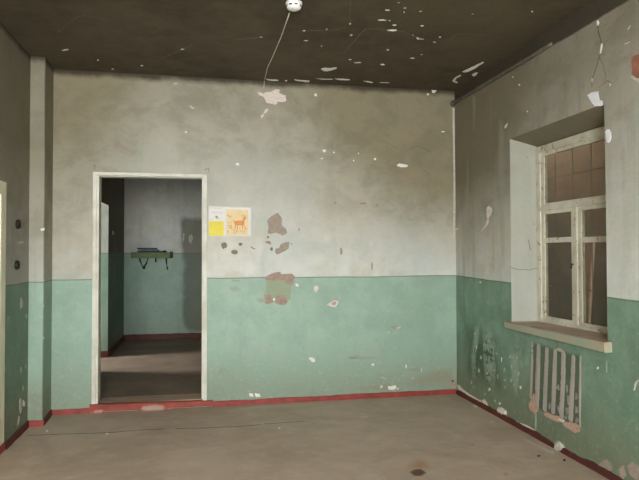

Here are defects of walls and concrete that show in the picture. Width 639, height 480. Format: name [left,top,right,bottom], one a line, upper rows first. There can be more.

crack [591,3,611,86]
flaking render [631,54,639,83]
flaking render [258,89,286,118]
peeling [588,91,603,106]
flaking render [265,213,292,254]
leakage [348,307,522,424]
flaking render [450,380,507,415]
flaking render [516,384,580,433]
flaking render [598,459,639,480]